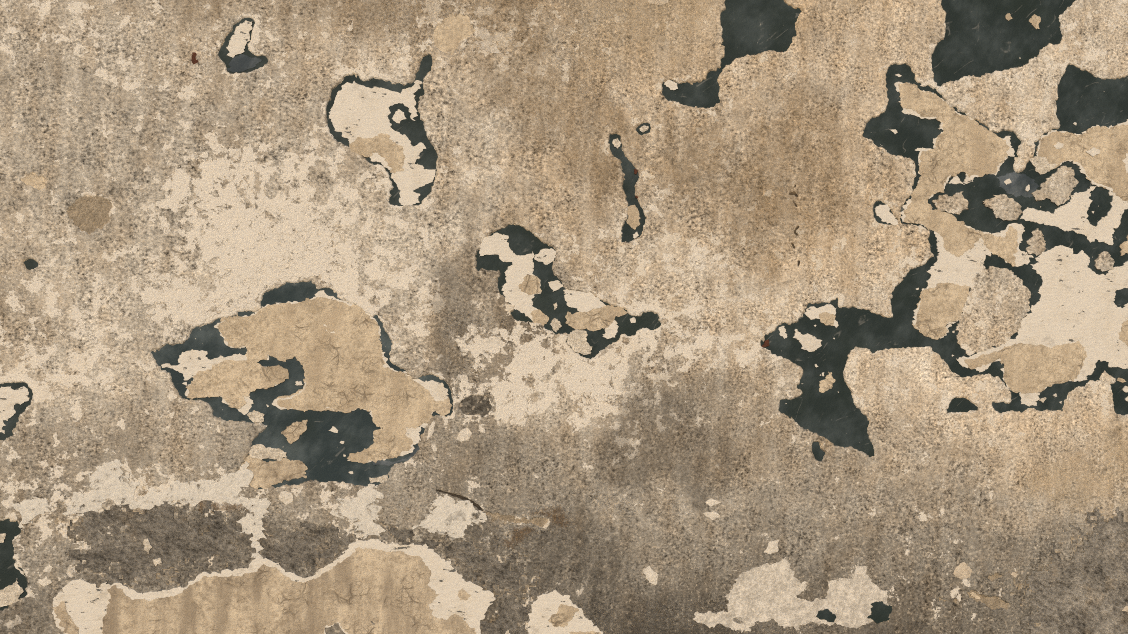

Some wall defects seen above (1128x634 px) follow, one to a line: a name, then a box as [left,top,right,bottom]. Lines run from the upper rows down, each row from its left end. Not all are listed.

peeling [218,18,268,74]
peeling [326,14,475,206]
peeling [475,224,661,359]
peeling [608,134,646,242]
peeling [636,123,651,135]
peeling [662,0,802,108]
peeling [760,0,1128,461]
peeling [0,382,33,441]
peeling [151,280,492,505]
peeling [0,499,603,634]
peeling [693,540,892,633]
spalling [939,507,1128,634]